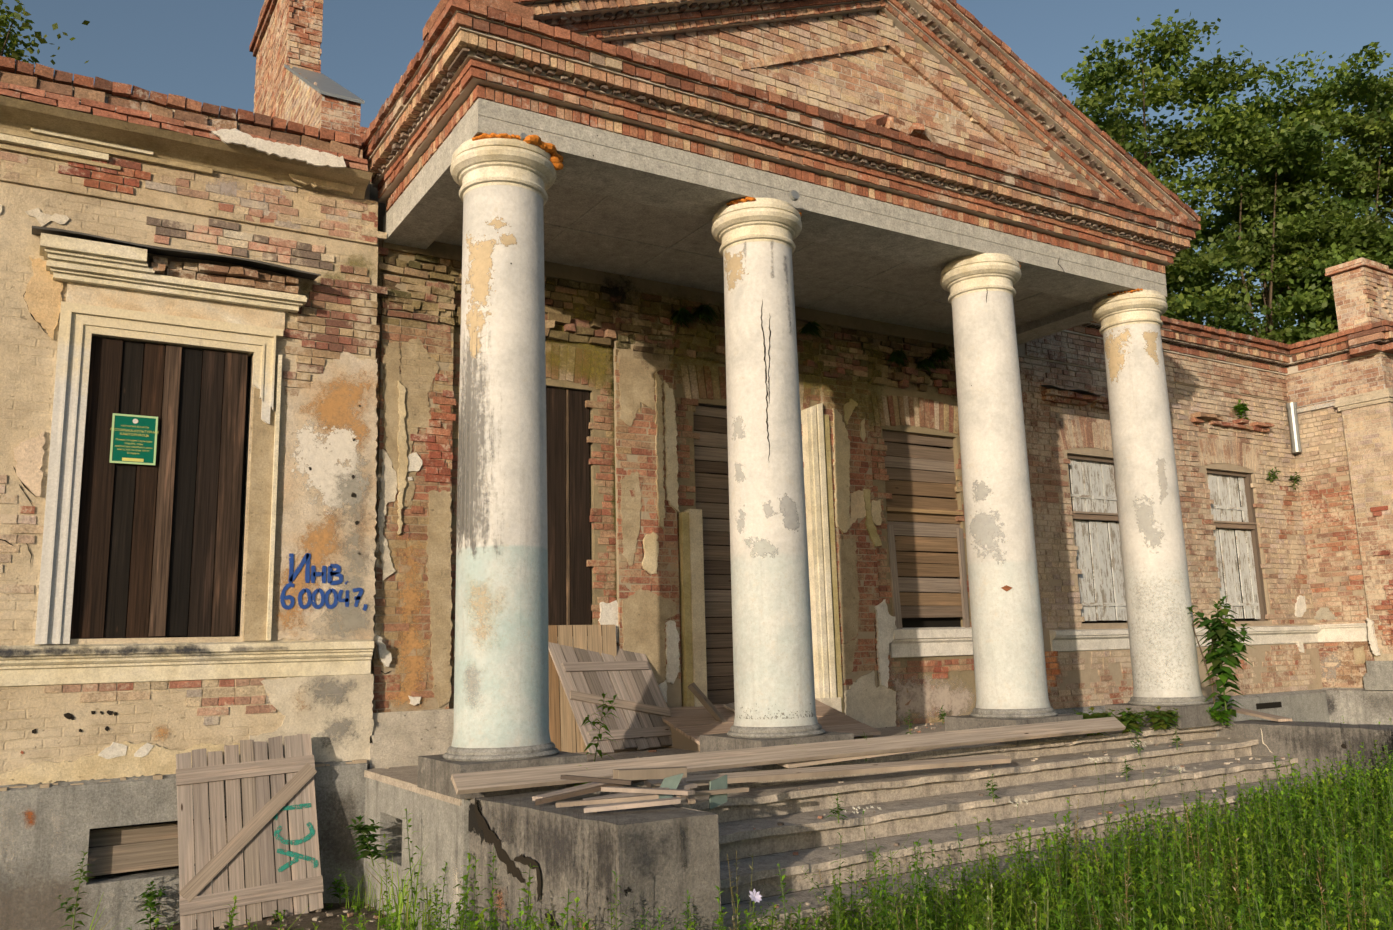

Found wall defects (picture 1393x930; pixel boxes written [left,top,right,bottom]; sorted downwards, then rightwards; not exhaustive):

damp [377,246,462,327]
peeling [465,217,517,359]
damp [544,276,726,365]
crack [761,299,771,460]
damp [790,321,957,396]
peeling [0,128,456,785]
damp [457,342,497,554]
peeling [617,337,680,704]
peeling [969,480,1006,564]
peeling [1133,458,1168,548]
flaking render [1336,580,1393,685]
crack [474,799,558,930]